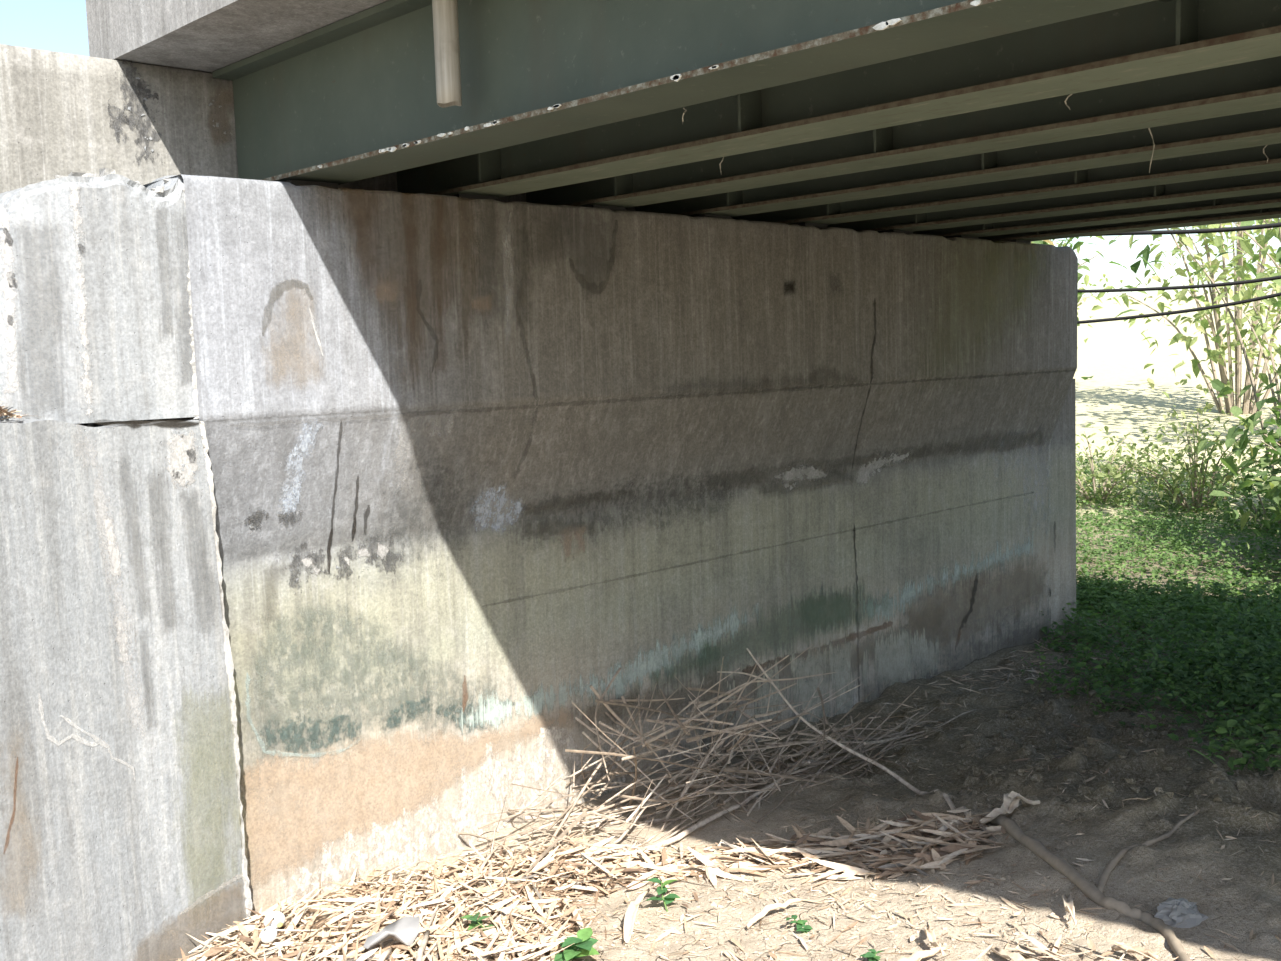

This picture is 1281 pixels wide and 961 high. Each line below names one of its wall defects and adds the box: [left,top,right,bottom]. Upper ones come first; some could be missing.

crack [852,298,876,468]
water stain [283,419,321,512]
crack [327,420,342,573]
water stain [471,487,522,532]
crack [853,525,861,687]
water stain [755,540,1033,727]
crack [955,574,978,652]